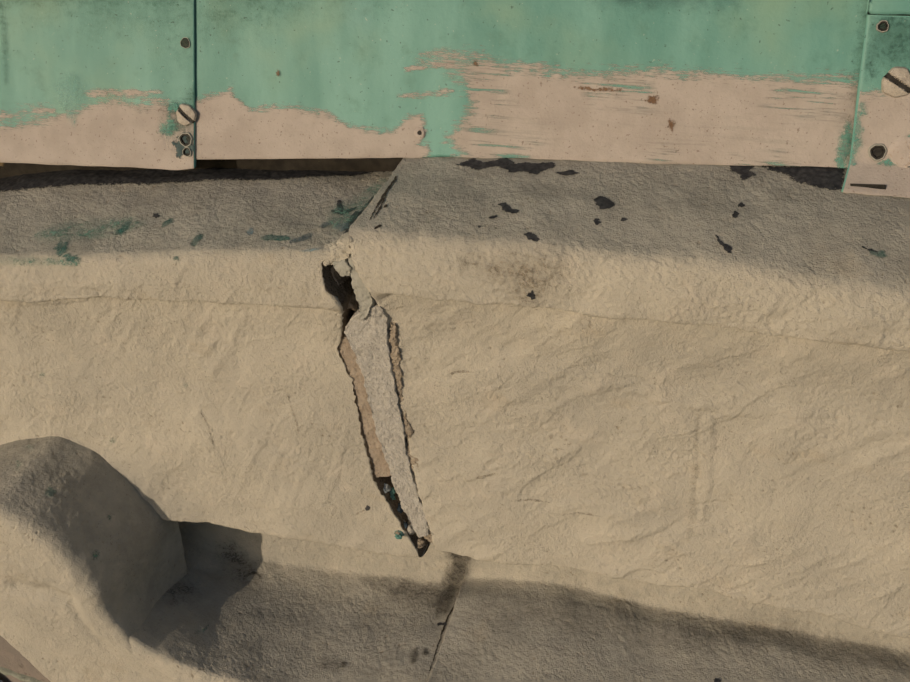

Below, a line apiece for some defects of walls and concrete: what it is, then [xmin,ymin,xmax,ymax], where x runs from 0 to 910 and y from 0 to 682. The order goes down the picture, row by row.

crack [370,176,397,229]
crack [323,232,359,311]
crack [388,322,420,482]
crack [429,606,454,671]